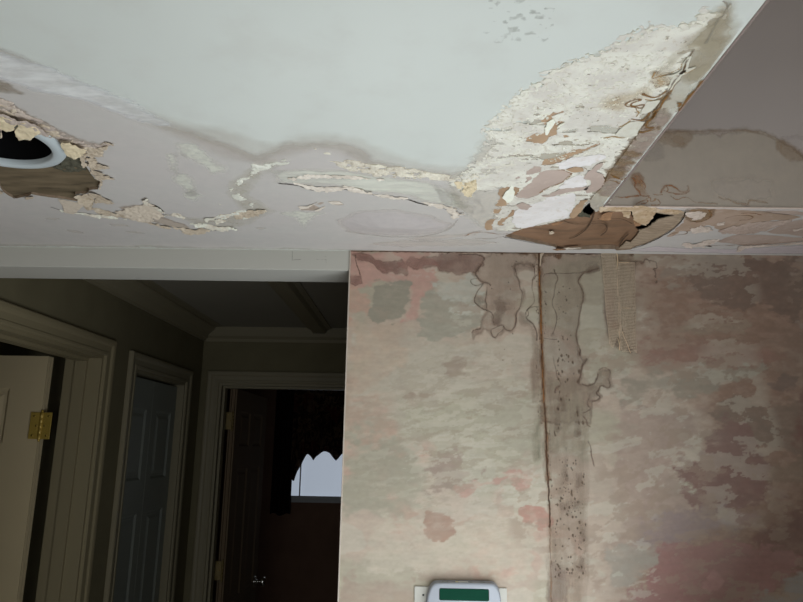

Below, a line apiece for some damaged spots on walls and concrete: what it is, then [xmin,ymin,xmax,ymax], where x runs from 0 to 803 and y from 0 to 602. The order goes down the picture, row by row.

peeling [0,98,267,235]
water stain [0,6,803,350]
crack [353,1,731,528]
peeling [485,141,606,230]
peeling [526,111,568,144]
peeling [632,209,803,254]
water stain [555,330,600,426]
water stain [548,460,586,550]